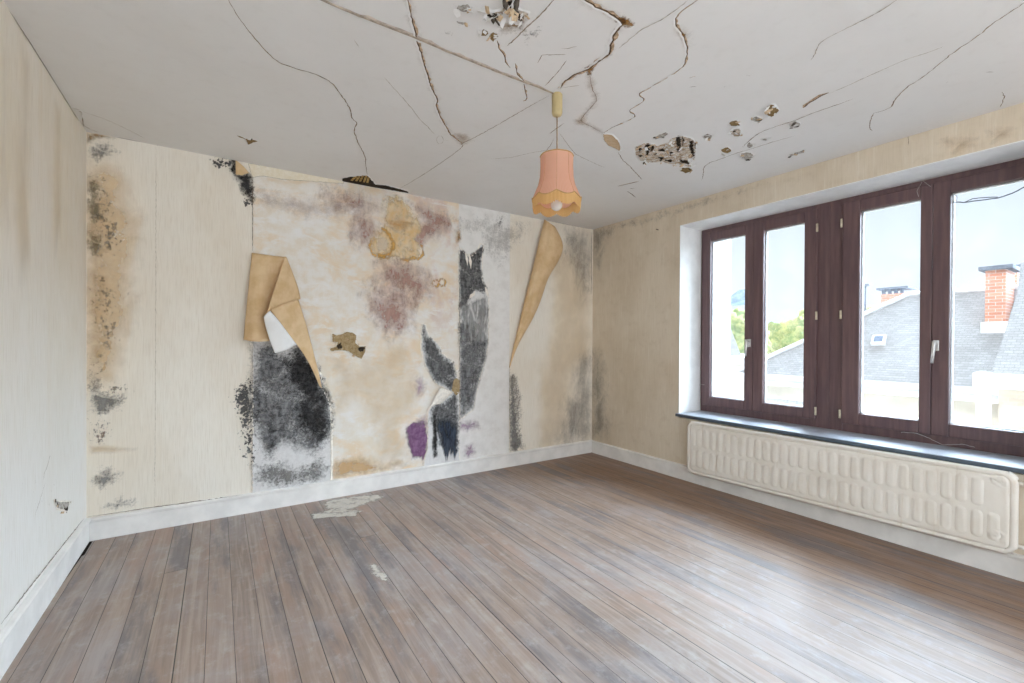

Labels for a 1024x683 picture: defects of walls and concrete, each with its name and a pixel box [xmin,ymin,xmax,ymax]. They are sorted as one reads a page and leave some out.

spalling [453,0,531,44]
crack [229,2,367,172]
crack [389,0,697,197]
crack [702,0,1024,179]
spalling [602,131,713,173]
spalling [720,103,780,161]
water stain [212,158,254,207]
spalling [341,174,409,194]
water stain [360,196,460,330]
spalling [329,331,366,359]
water stain [93,371,122,443]
water stain [406,422,428,459]